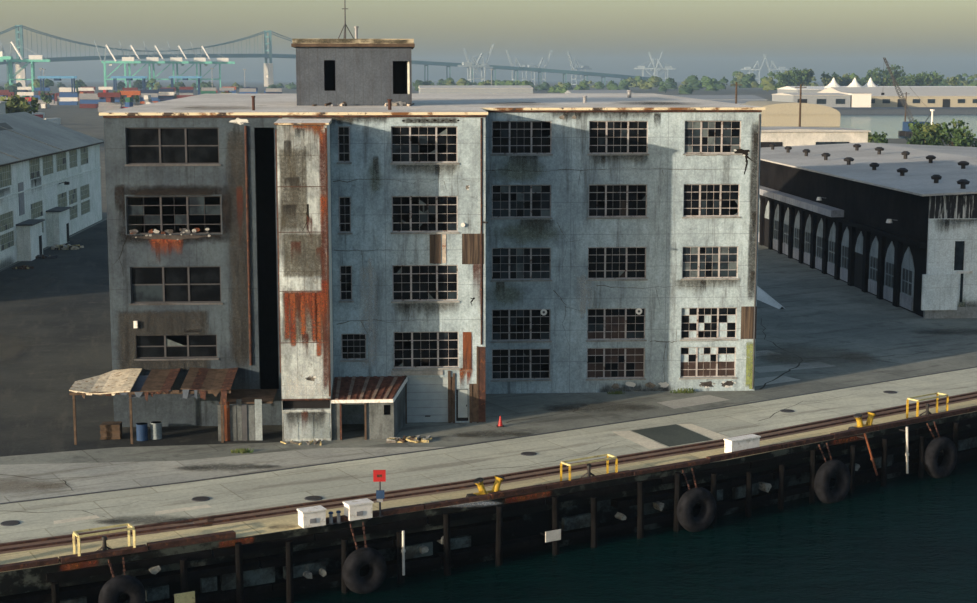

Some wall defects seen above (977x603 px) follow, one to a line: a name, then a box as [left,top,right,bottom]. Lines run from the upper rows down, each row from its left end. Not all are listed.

rust [151,239,182,255]
rust [283,125,329,387]
crack [760,319,924,389]